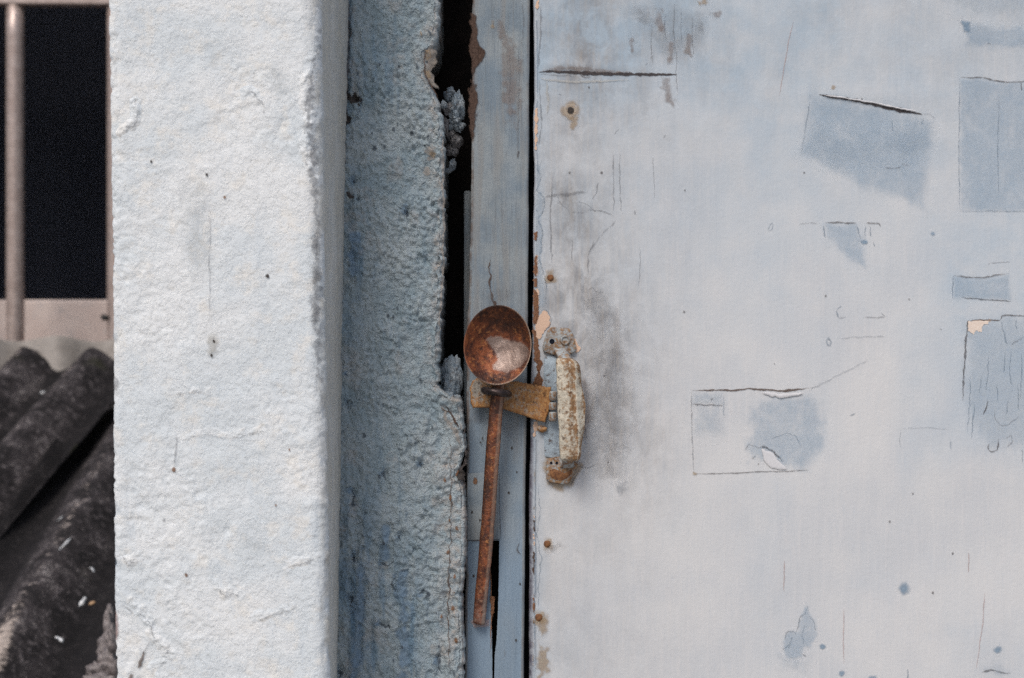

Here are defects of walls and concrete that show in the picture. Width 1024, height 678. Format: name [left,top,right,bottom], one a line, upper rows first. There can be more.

crack [538,70,677,88]
peeling [819,94,921,114]
spalling [423,13,485,330]
peeling [963,314,1022,396]
peeling [693,388,805,406]
peeling [708,446,803,474]
rust [550,469,573,480]